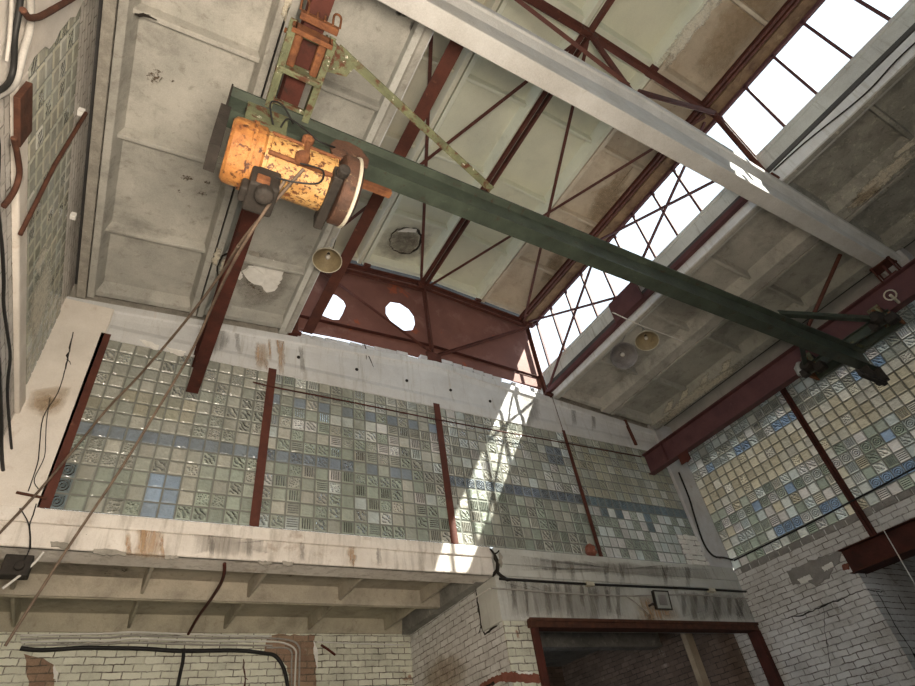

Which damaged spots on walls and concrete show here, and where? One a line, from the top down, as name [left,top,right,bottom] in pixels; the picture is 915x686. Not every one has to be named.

peeling [238,250,283,292]
rust [126,530,164,553]
peeling [787,551,850,587]
crack [786,574,915,679]
peeling [24,654,59,686]
peeling [264,634,318,686]